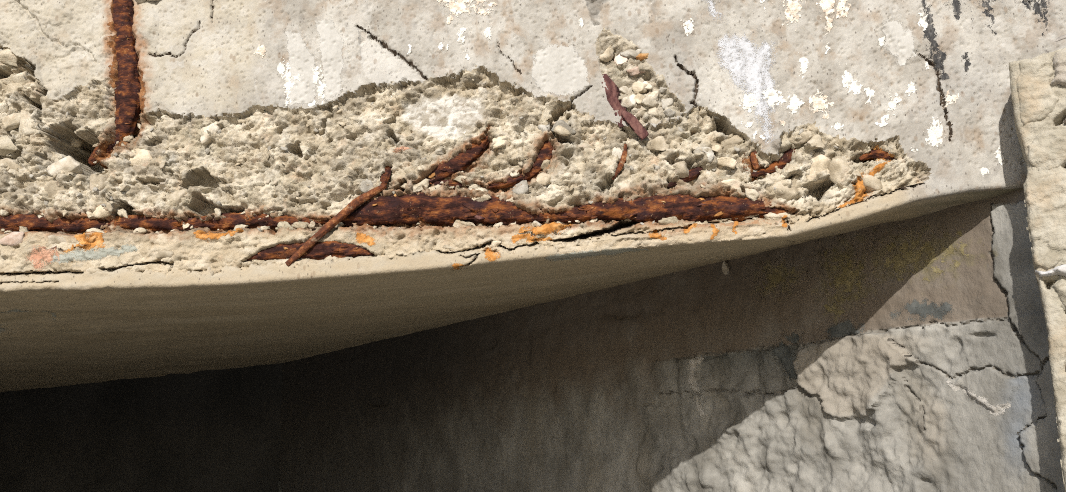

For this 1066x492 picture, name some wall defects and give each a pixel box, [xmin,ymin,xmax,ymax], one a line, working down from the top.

corrosion [88,0,146,169]
crack [357,25,428,80]
spalling [0,0,932,277]
corrosion [601,74,649,141]
crack [675,55,699,108]
water stain [739,85,844,140]
water stain [760,0,851,54]
water stain [910,0,959,152]
water stain [945,0,1063,36]
corrosion [0,134,796,274]
crack [0,261,174,284]
crack [659,203,1057,489]